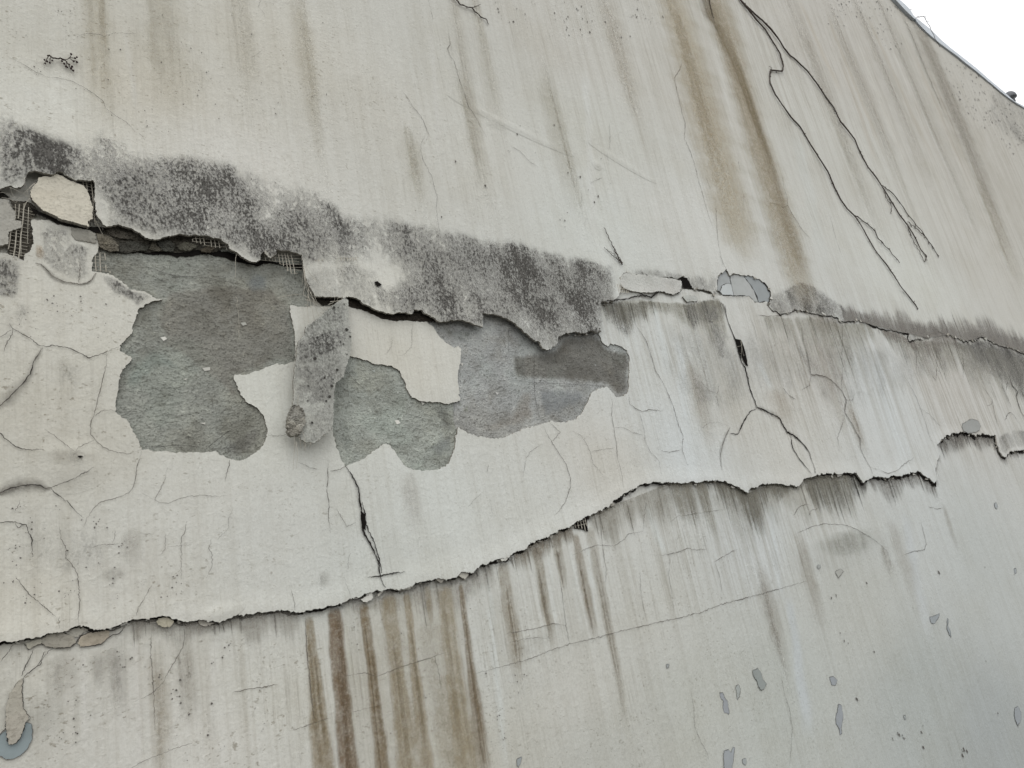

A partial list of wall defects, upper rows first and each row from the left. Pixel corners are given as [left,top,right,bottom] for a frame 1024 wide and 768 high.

spalling [83,182,312,461]
leakage [0,121,724,348]
spalling [316,303,629,471]
crack [602,276,698,306]
peeling [717,271,770,303]
crack [750,277,1024,459]
leakage [771,283,1024,396]
crack [0,290,936,745]
leakage [596,481,787,530]
peeling [0,679,33,760]
corrosion [312,612,356,768]
corrosion [362,607,388,768]